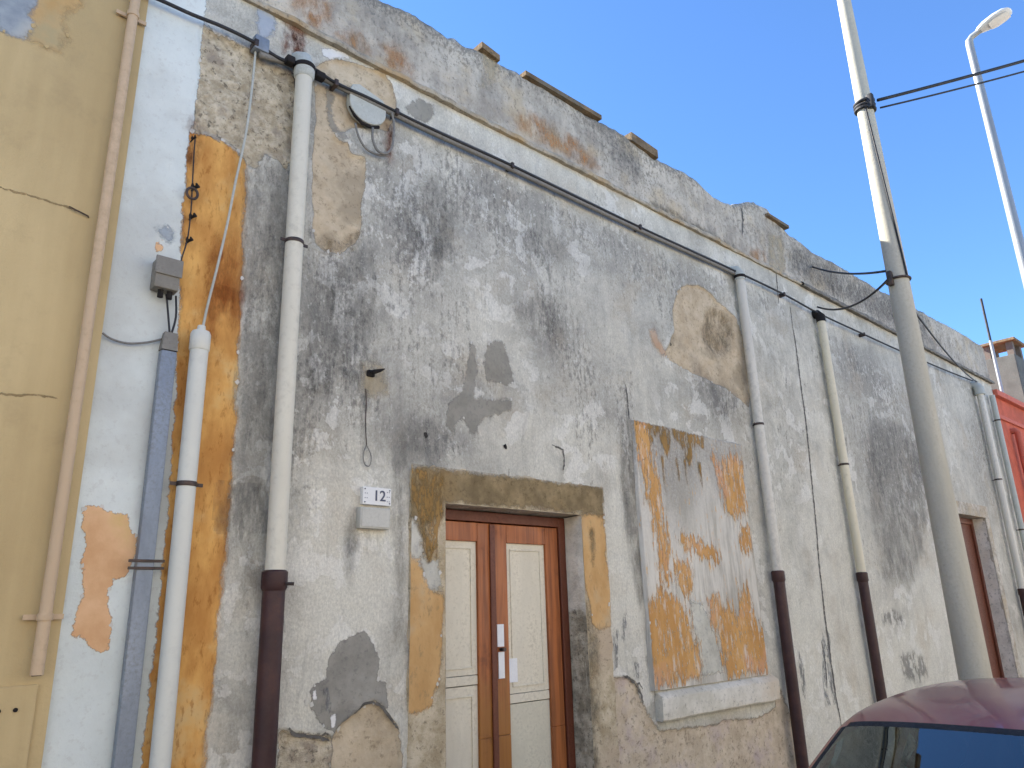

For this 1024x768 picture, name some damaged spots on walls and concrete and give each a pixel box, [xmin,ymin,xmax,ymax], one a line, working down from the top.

peeling [0,0,37,39]
crack [0,187,75,211]
flaking render [312,56,434,255]
peeling [141,24,295,768]
flaking render [651,285,750,407]
peeling [71,504,138,653]
peeling [409,516,444,713]
peeling [581,514,611,630]
peeling [634,420,768,690]
crack [776,273,841,723]
peeling [276,631,403,768]